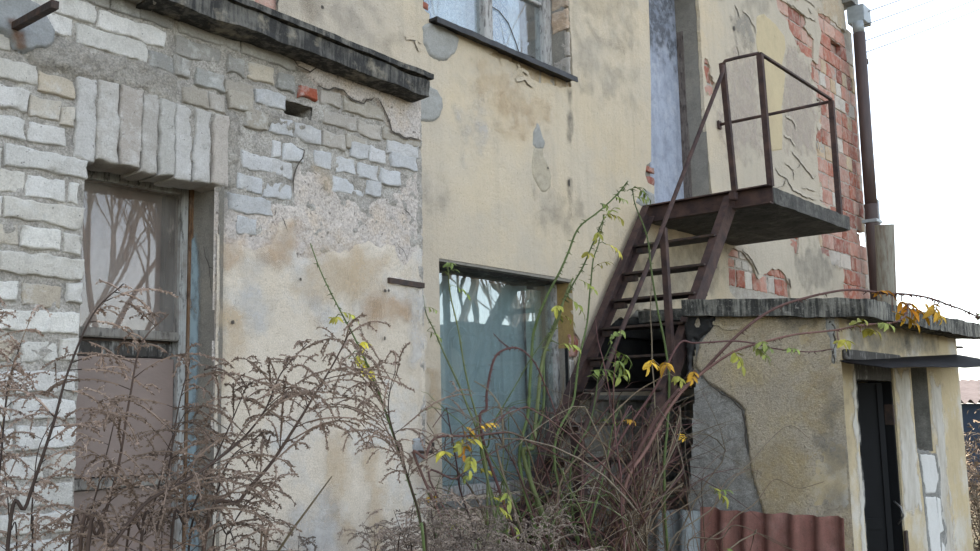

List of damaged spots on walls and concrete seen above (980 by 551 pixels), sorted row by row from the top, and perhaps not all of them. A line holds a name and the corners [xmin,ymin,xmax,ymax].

spalling [255,0,276,10]
spalling [489,0,571,88]
peeling [295,61,421,141]
spalling [776,0,870,299]
spalling [725,245,792,299]
spalling [560,400,651,550]
spalling [637,377,761,513]